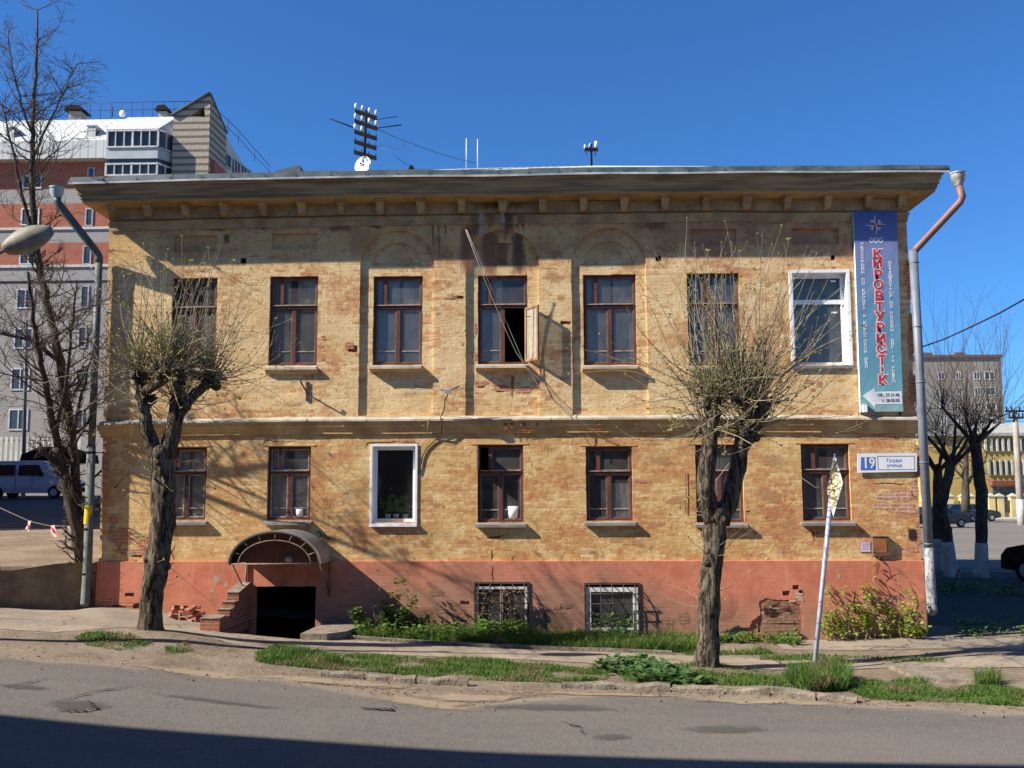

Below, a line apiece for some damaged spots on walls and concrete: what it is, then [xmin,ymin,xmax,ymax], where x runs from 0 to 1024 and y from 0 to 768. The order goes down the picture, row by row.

peeling [875,446,922,553]
peeling [758,585,804,639]